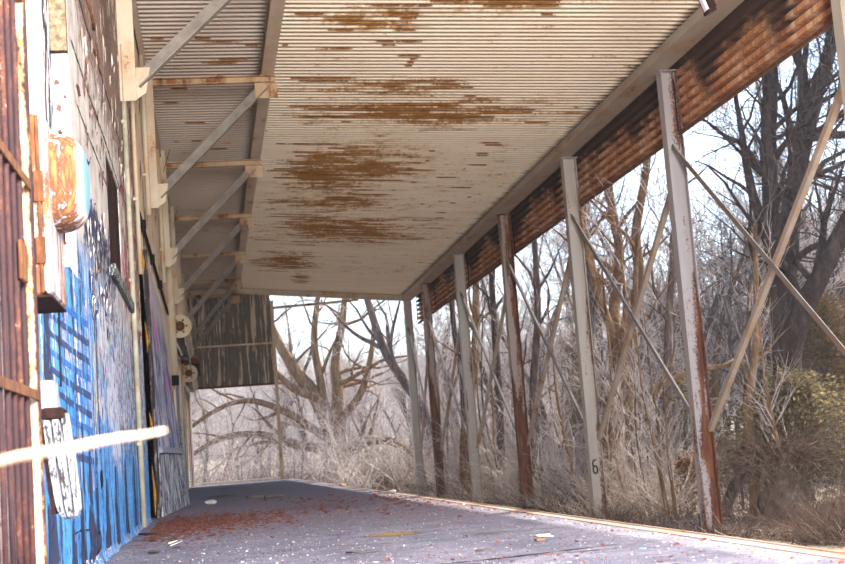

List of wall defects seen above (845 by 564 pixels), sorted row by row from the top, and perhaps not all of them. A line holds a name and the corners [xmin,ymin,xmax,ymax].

corrosion [294,0,562,67]
corrosion [289,77,581,126]
corrosion [250,143,446,283]